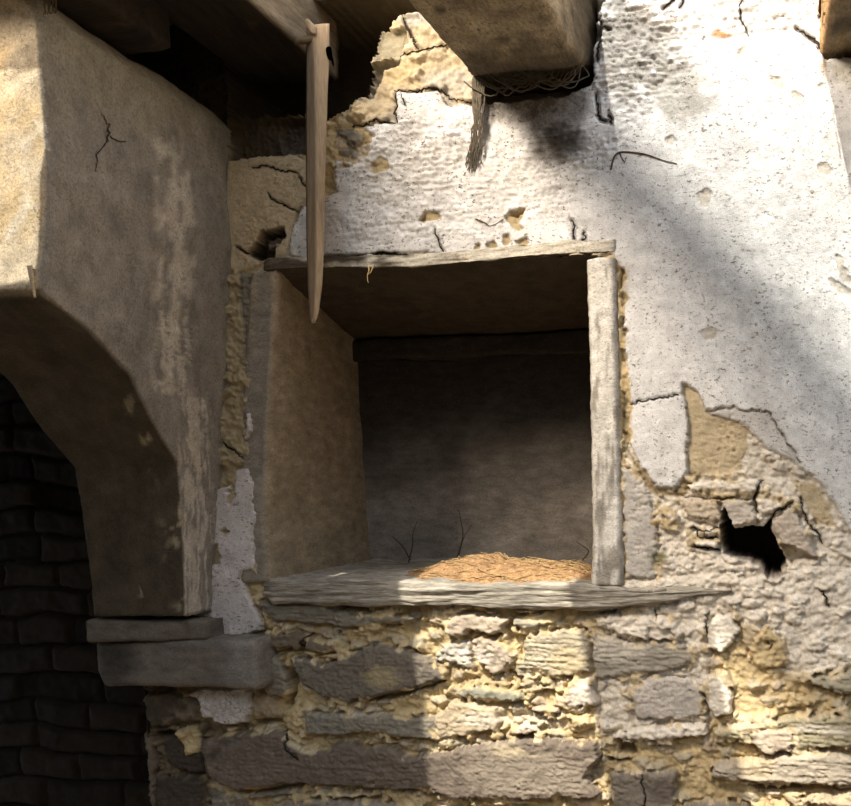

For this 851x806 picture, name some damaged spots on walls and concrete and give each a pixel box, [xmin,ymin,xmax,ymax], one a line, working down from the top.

flaking render [344,12,473,127]
crack [400,18,447,57]
crack [594,18,613,124]
crack [352,86,472,128]
crack [95,114,126,172]
crack [252,165,306,186]
flaking render [369,156,390,174]
flaking render [618,268,629,337]
peeling [195,468,265,635]
crack [692,527,720,550]
flaking render [621,385,851,592]
crack [753,480,823,544]